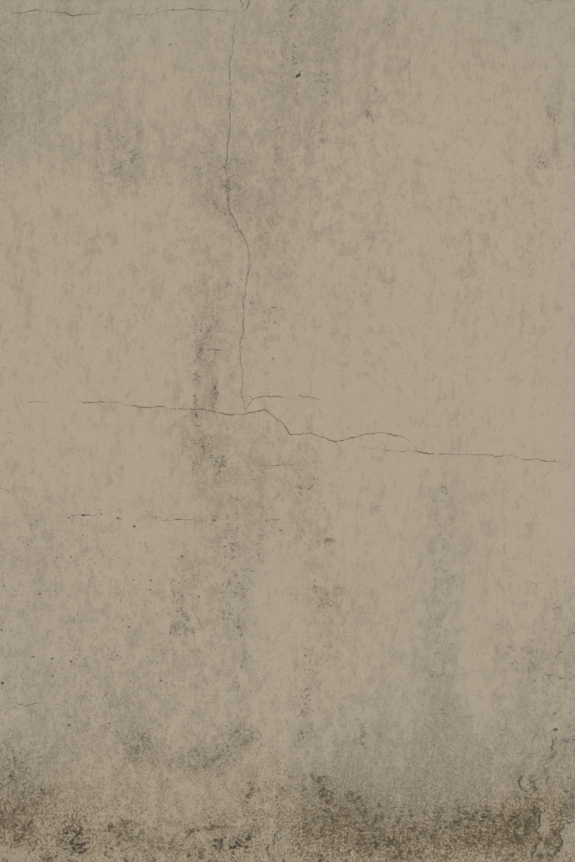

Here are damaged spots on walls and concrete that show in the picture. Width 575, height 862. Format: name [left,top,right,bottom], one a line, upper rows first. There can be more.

crack [170,0,250,170]
crack [83,198,560,462]
mould [187,823,252,862]